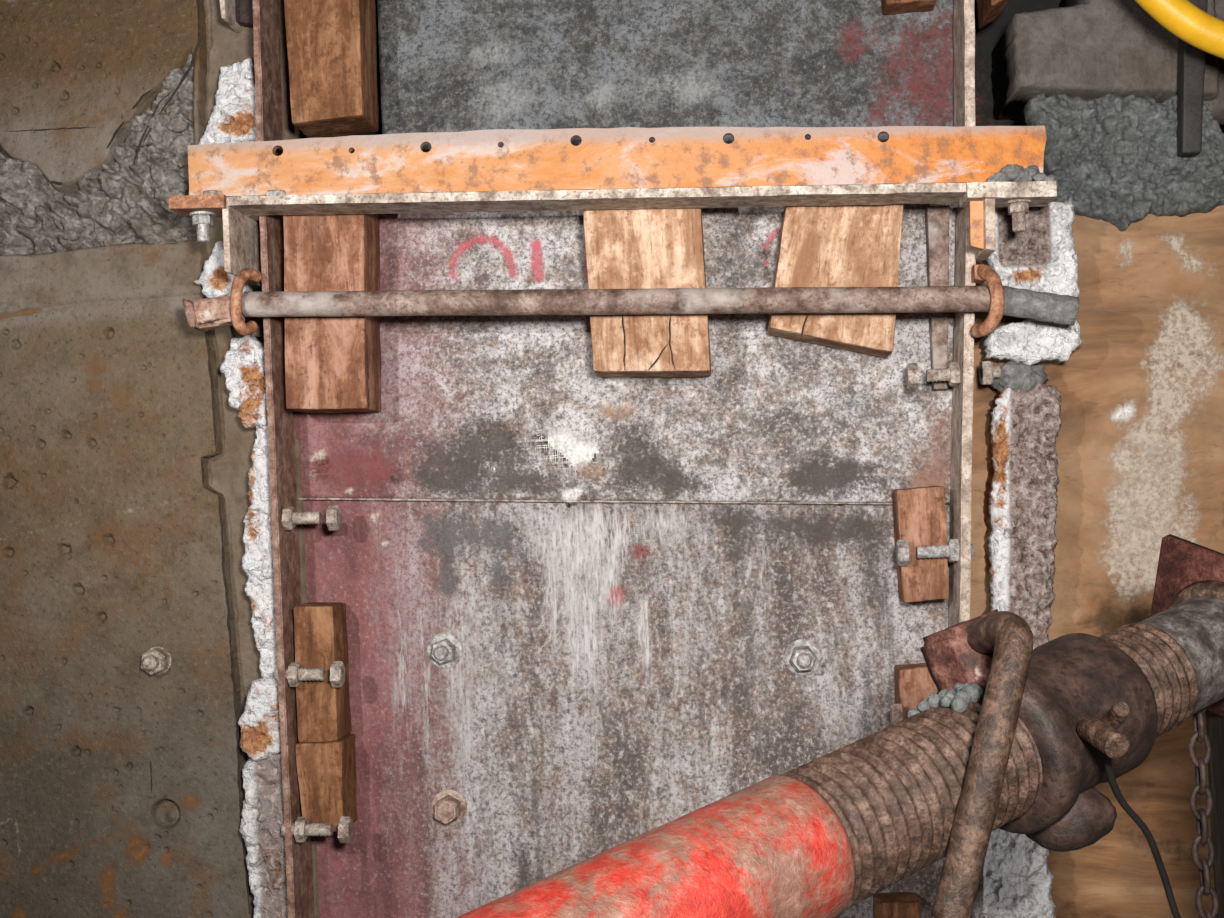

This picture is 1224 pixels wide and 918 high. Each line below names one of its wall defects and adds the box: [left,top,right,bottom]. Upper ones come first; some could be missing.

spalling [0,53,197,255]
crack [201,332,250,913]